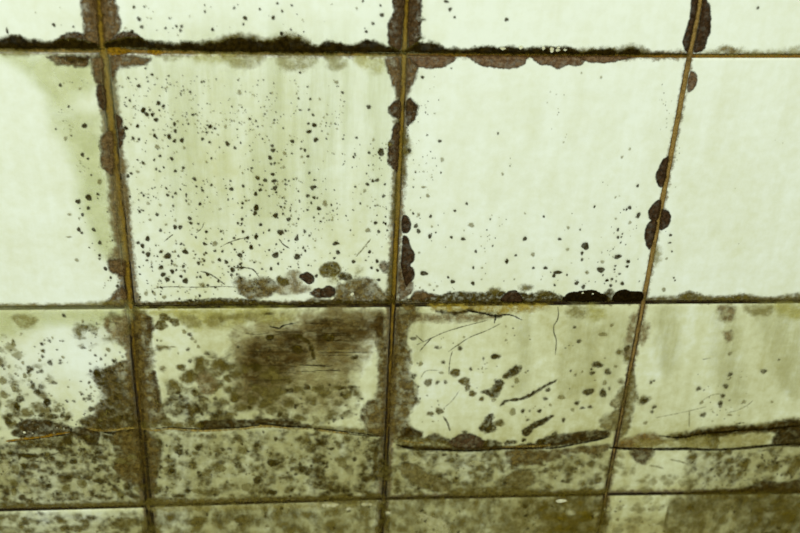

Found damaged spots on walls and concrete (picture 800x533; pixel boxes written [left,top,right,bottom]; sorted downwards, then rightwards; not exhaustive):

corrosion [107,47,131,56]
mould [0,0,711,243]
water stain [0,200,800,533]
crack [417,310,518,370]
crack [6,423,800,452]